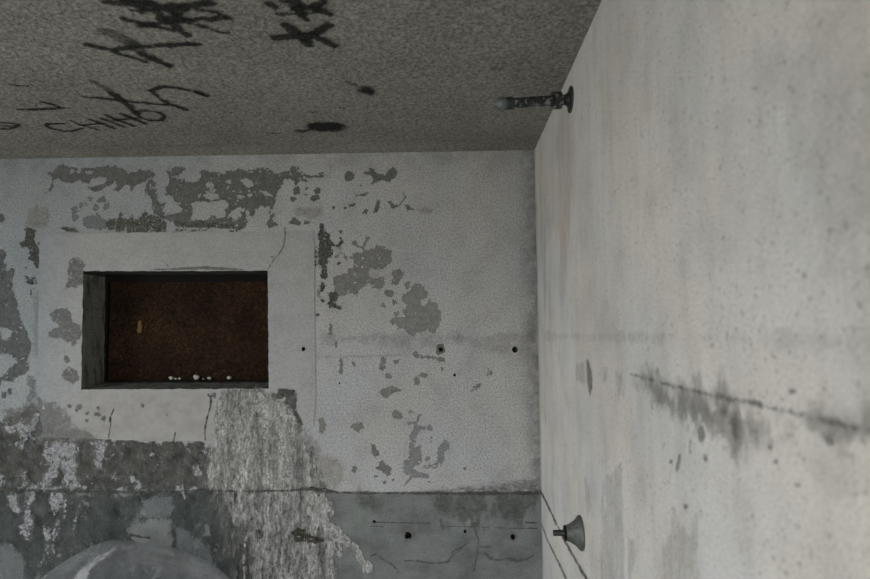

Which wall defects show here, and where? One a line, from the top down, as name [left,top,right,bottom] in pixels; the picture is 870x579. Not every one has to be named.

peeling [45,164,327,233]
peeling [332,167,414,214]